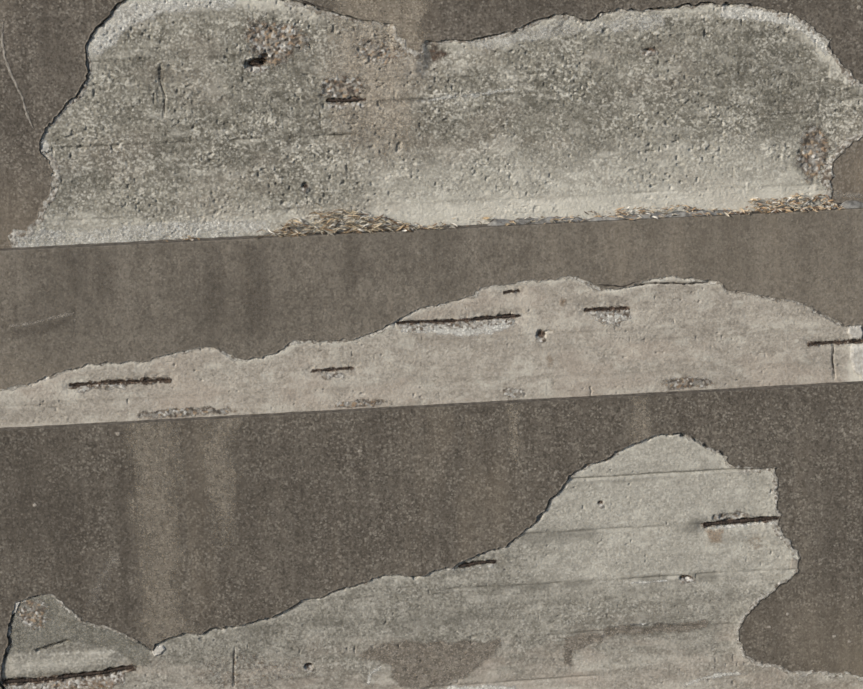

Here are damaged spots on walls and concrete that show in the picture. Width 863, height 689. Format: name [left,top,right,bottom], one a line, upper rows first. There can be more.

spalling [8,0,863,248]
spalling [0,275,863,436]
spalling [0,432,863,689]
leakage [360,639,515,689]